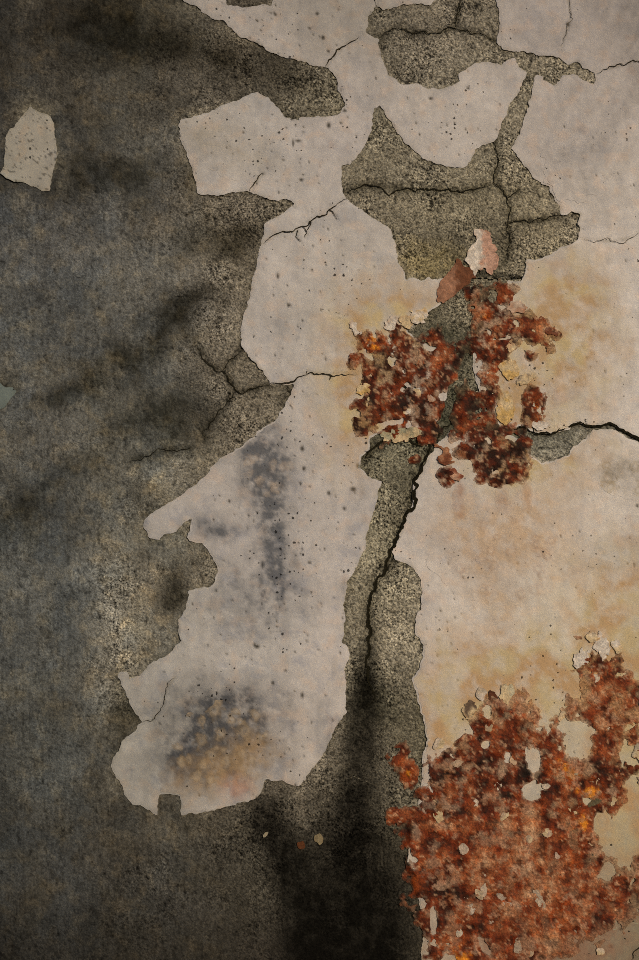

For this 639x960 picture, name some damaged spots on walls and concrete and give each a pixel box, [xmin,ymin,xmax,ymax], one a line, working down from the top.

peeling [0,0,345,384]
crack [265,145,560,260]
crack [383,0,495,42]
peeling [341,0,595,327]
peeling [0,255,294,960]
peeling [263,720,427,821]
peeling [342,434,443,692]
crack [365,414,451,706]
rust [301,229,639,520]
rust [384,513,639,960]
peeling [512,424,639,463]
crack [514,422,639,440]